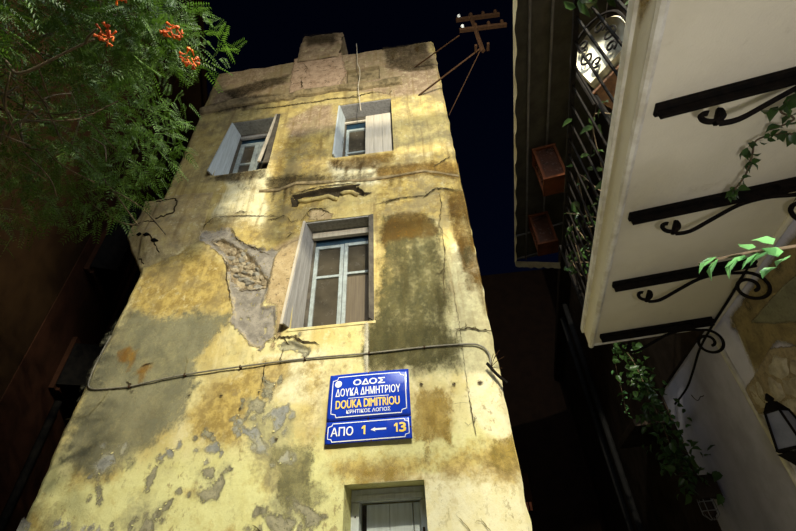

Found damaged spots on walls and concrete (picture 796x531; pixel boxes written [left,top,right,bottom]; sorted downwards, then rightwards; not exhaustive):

spalling [291,181,371,220]
damp [361,213,462,372]
crack [378,156,492,436]
peeling [69,227,311,505]
crack [261,334,319,384]
peeling [128,428,233,531]
peeling [16,518,30,531]
peeling [54,516,100,531]
peeling [244,497,328,531]